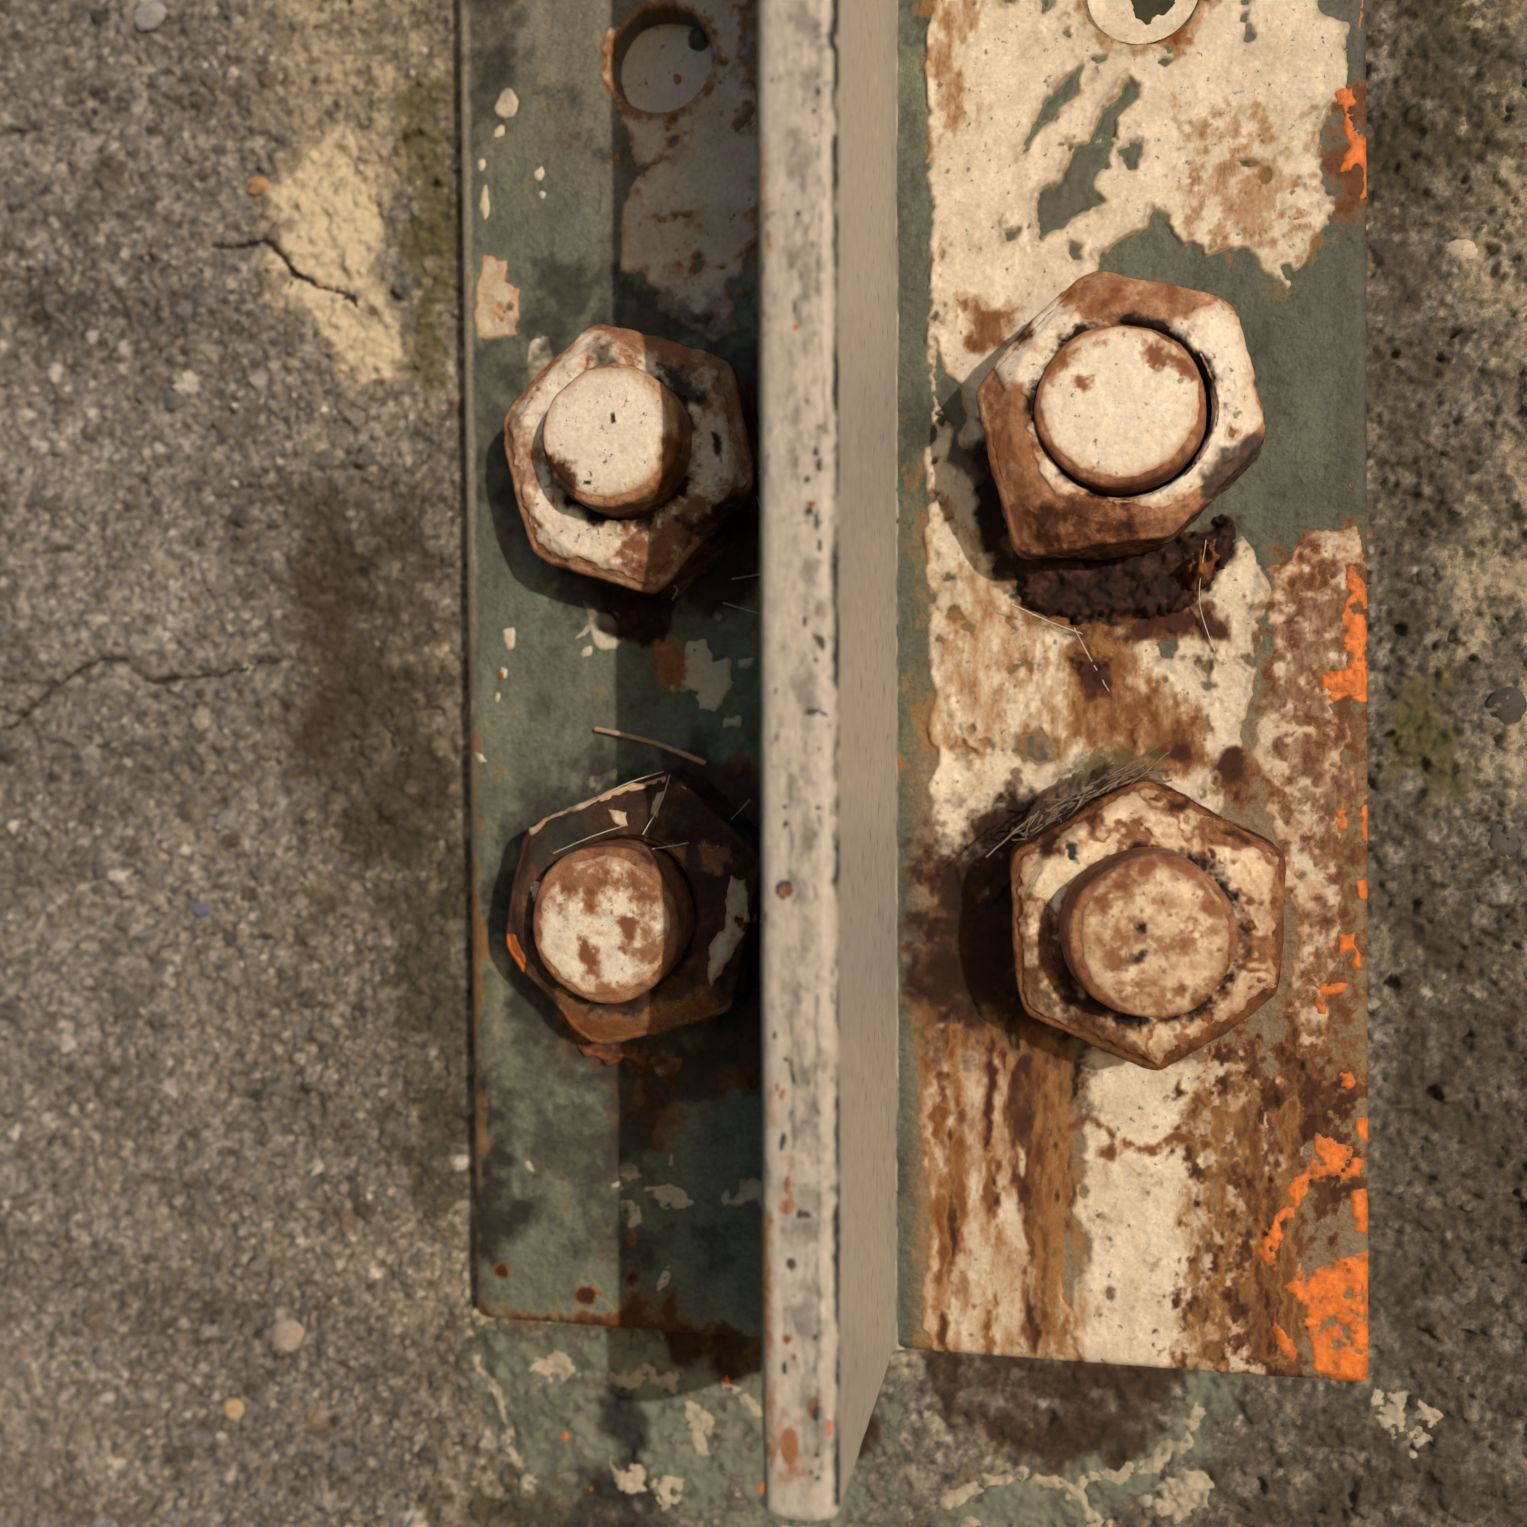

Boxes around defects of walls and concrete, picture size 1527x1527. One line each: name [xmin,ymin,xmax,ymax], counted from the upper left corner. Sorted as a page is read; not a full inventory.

crack [211,221,375,315]
peeling [473,255,552,383]
peeling [576,609,621,657]
corrosion [503,328,760,691]
peeling [600,0,821,1509]
peeling [921,0,1350,868]
corrosion [903,271,1368,1378]
peeling [1105,526,1367,1058]
corrosion [1185,104,1322,250]
corrosion [481,1191,794,1389]
corrosion [857,1412,880,1459]
peeling [918,1022,1306,1376]